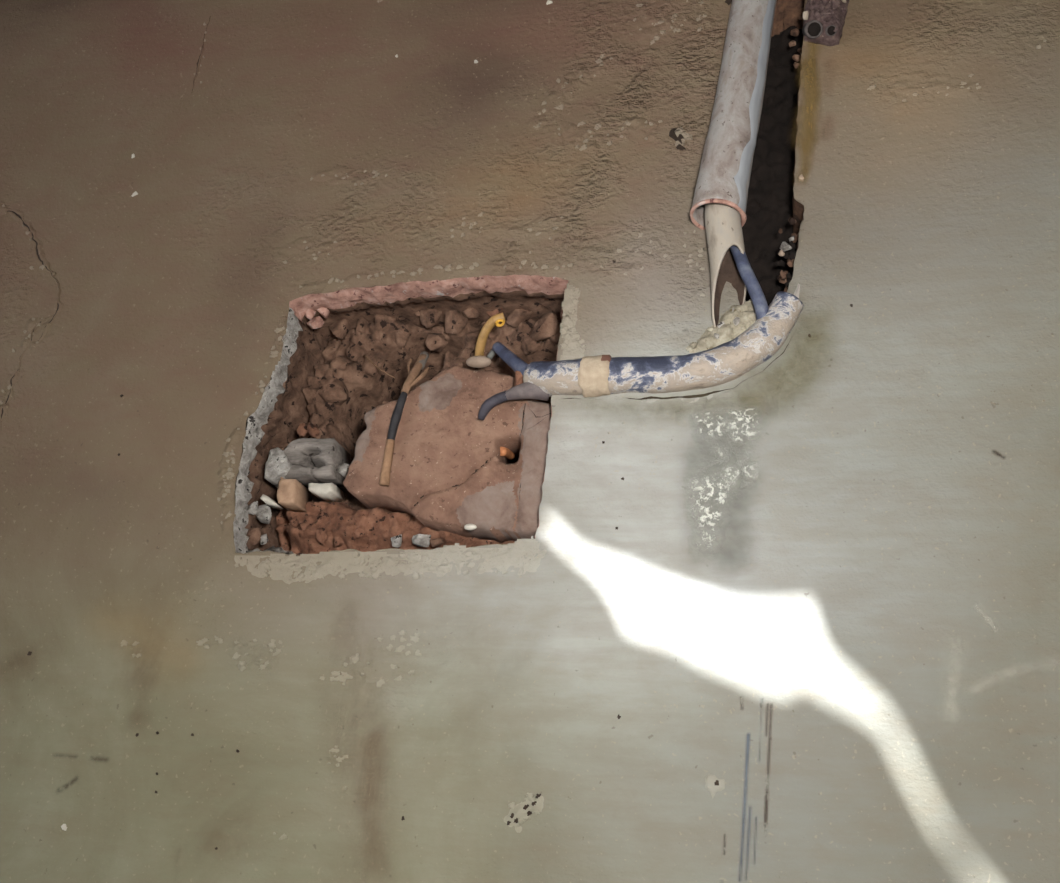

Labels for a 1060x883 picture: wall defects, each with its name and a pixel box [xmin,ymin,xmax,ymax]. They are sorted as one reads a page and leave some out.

crack [0,204,64,433]
spalling [216,211,586,584]
water stain [692,395,757,546]